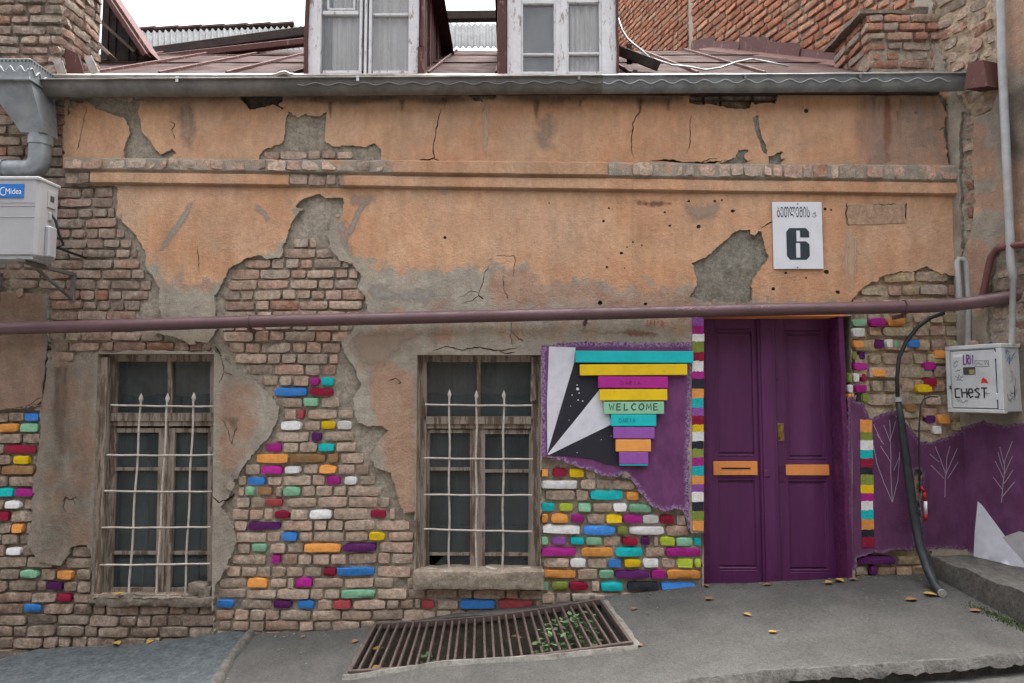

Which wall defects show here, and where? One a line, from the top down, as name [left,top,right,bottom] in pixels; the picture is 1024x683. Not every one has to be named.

crack [421,110,444,161]
crack [628,102,723,164]
flaking render [608,96,905,179]
flaking render [690,226,767,305]
flaking render [0,96,702,669]
crack [437,324,523,354]
flaking render [846,267,961,441]